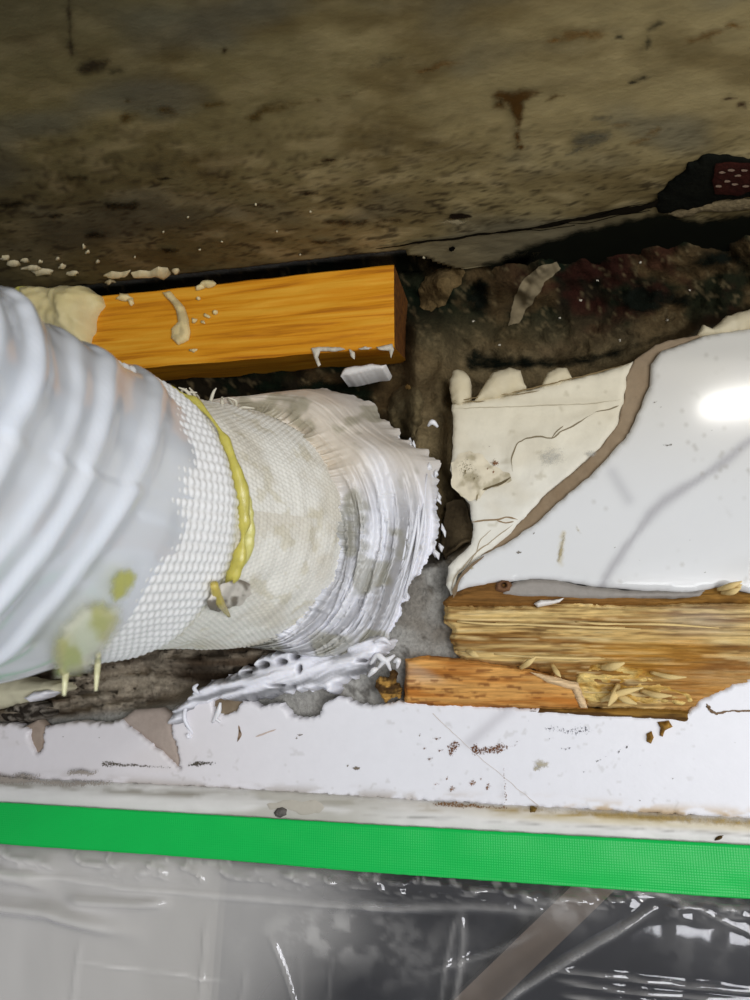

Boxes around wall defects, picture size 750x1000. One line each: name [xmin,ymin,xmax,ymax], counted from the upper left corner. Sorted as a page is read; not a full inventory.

rust [494,89,539,150]
crack [376,200,658,249]
damp [483,213,750,270]
damp [467,279,490,311]
damp [618,286,690,313]
damp [467,349,623,371]
flaking render [432,451,512,560]
spalling [215,699,243,715]
spalling [25,719,51,752]
spalling [123,707,180,766]